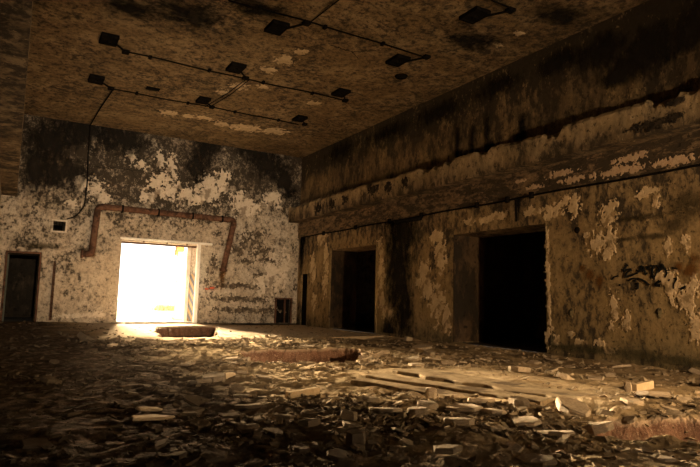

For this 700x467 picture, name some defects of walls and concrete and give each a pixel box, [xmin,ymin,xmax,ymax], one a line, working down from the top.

leakage [579,6,700,88]
leakage [21,144,91,191]
flaking render [63,175,113,209]
leakage [61,121,151,155]
flaking render [124,149,282,218]
leakage [187,142,222,184]
peeling [159,110,289,135]
leakage [455,117,495,157]
flaking render [230,244,291,304]
leakage [383,226,414,335]
flaking render [415,229,452,336]
flaking render [650,268,700,346]